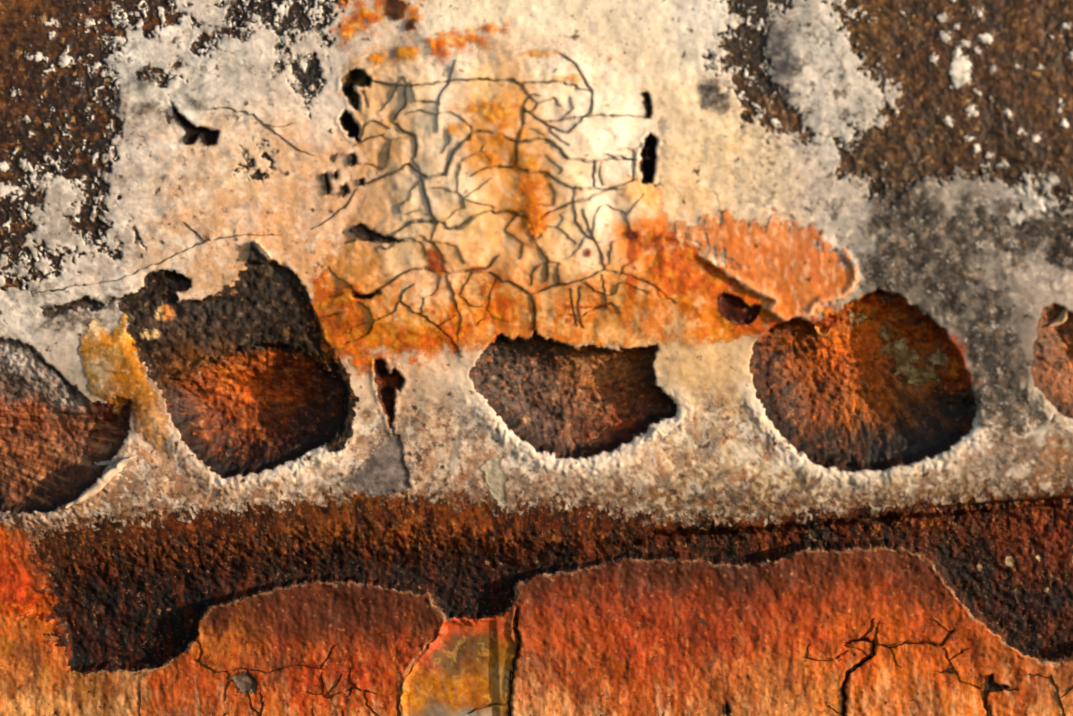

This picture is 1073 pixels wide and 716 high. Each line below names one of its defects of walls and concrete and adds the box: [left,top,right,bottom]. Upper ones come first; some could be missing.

leakage [769,23,800,98]
crack [321,52,677,356]
peeling [41,241,360,453]
peeling [675,207,859,338]
leakage [848,173,1073,453]
peeling [1048,309,1067,326]
peeling [65,454,138,508]
crack [196,642,432,716]
crack [469,611,520,716]
peeling [0,521,1073,716]
crack [805,620,1073,716]